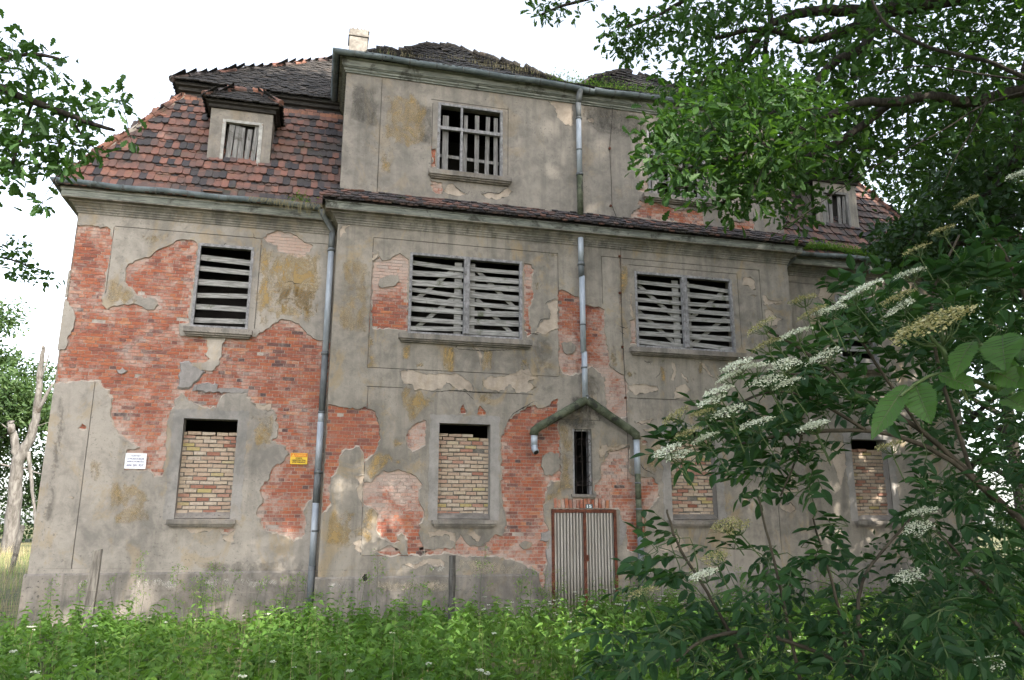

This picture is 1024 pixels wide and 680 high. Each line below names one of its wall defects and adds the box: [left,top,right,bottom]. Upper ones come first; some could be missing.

peeling [430,181,467,197]
peeling [481,188,513,200]
spalling [631,181,705,225]
damp [259,258,316,315]
spalling [54,217,660,590]